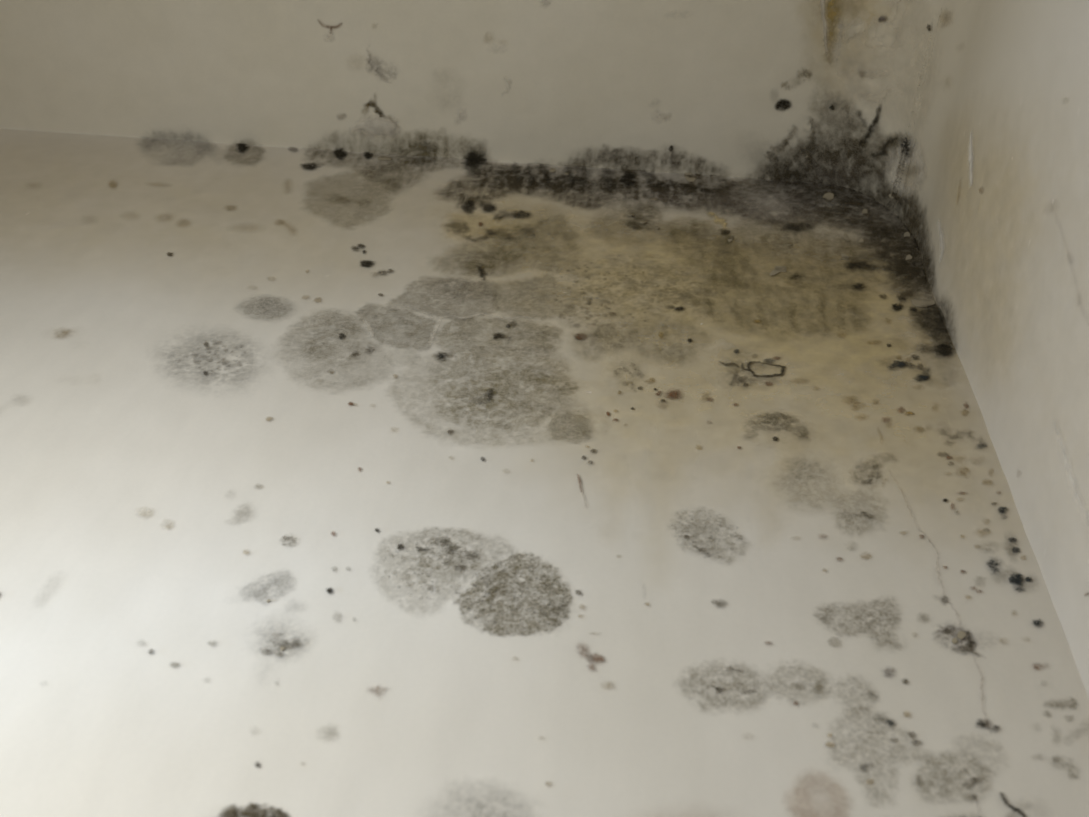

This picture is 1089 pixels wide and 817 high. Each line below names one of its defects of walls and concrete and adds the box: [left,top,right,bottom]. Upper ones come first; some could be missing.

leakage [859,107,880,144]
leakage [302,135,448,186]
leakage [352,244,392,275]
leakage [440,146,930,400]
leakage [447,366,573,416]
leakage [762,413,807,441]
leakage [416,540,581,635]
leakage [942,627,977,654]
crack [1000,792,1026,817]